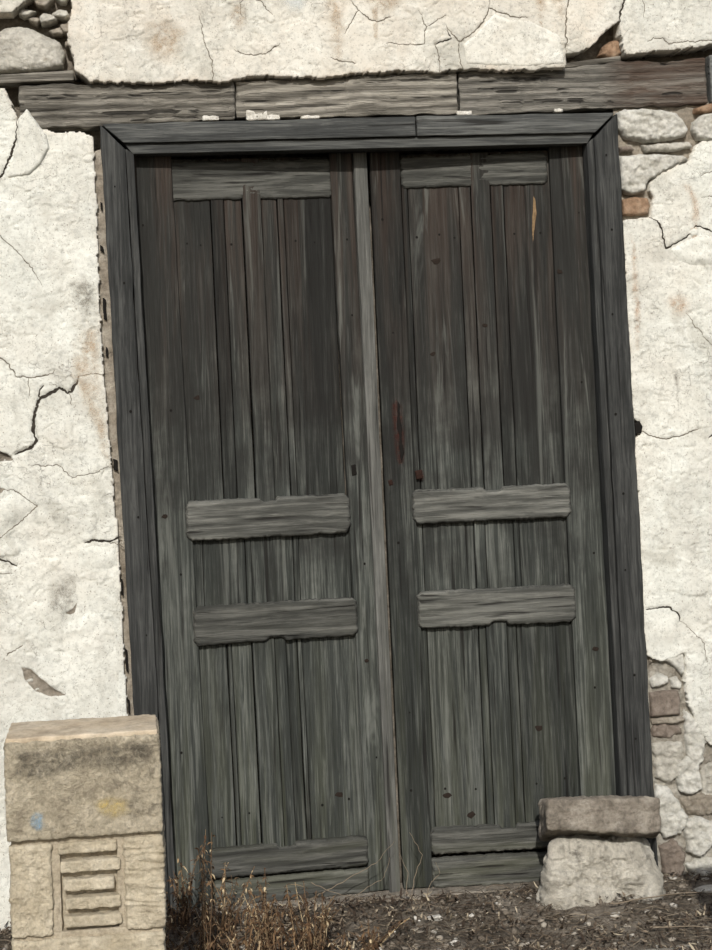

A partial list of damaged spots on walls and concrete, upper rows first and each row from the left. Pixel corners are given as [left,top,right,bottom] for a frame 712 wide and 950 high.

spalling [0,0,79,80]
crack [344,0,527,72]
crack [618,0,712,44]
crack [0,119,18,178]
spalling [611,103,712,221]
crack [648,216,712,249]
crack [0,357,107,478]
spalling [93,149,134,716]
crack [85,536,125,550]
crack [646,606,707,660]
spalling [22,668,65,696]
spalling [647,654,712,879]